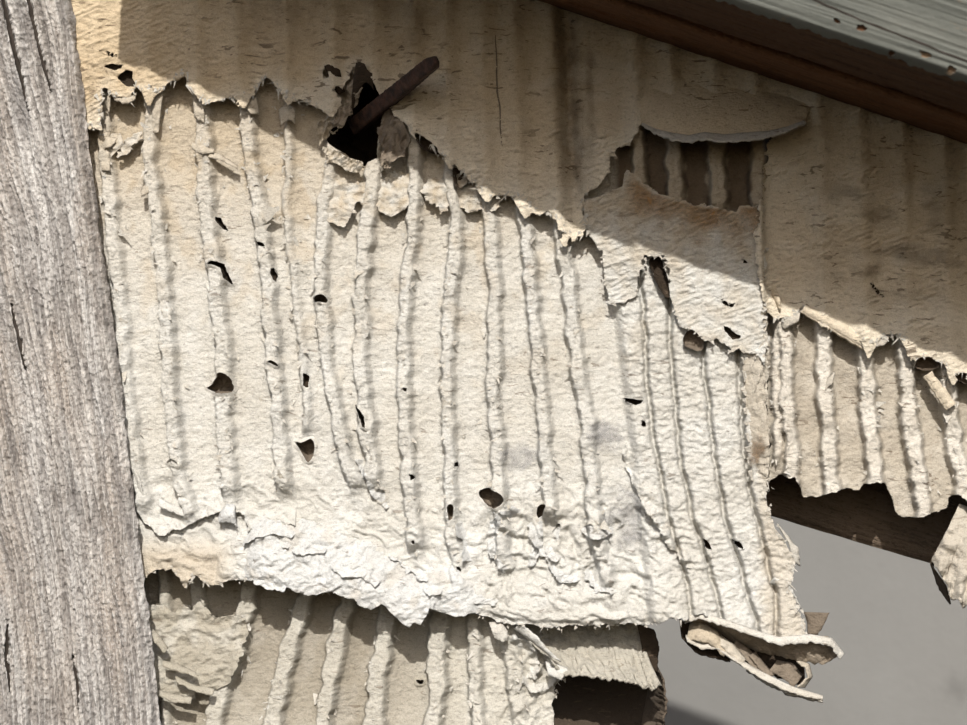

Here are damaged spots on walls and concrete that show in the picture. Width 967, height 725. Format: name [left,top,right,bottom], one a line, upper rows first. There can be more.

peeling [106,91,137,113]
peeling [152,92,163,133]
peeling [640,84,810,144]
peeling [101,136,141,172]
peeling [740,285,890,482]
peeling [923,366,956,410]
peeling [129,461,297,536]
peeling [622,441,692,569]
peeling [930,504,967,609]
peeling [149,601,249,704]
peeling [489,620,662,692]
peeling [679,577,844,703]